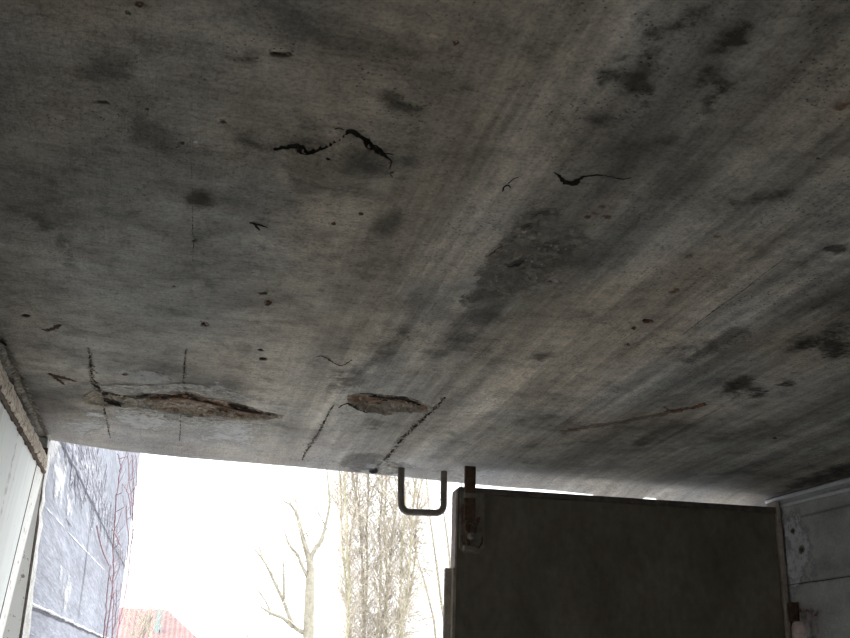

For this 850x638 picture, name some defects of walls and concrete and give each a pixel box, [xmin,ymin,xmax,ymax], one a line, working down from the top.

damp [709,22,751,54]
crack [273,128,393,178]
crack [554,172,630,186]
damp [795,323,850,359]
crack [47,348,111,438]
crack [153,349,189,441]
spalling [82,372,284,426]
crack [302,403,367,460]
spalling [347,393,431,416]
crack [382,397,446,461]
damp [724,376,766,398]